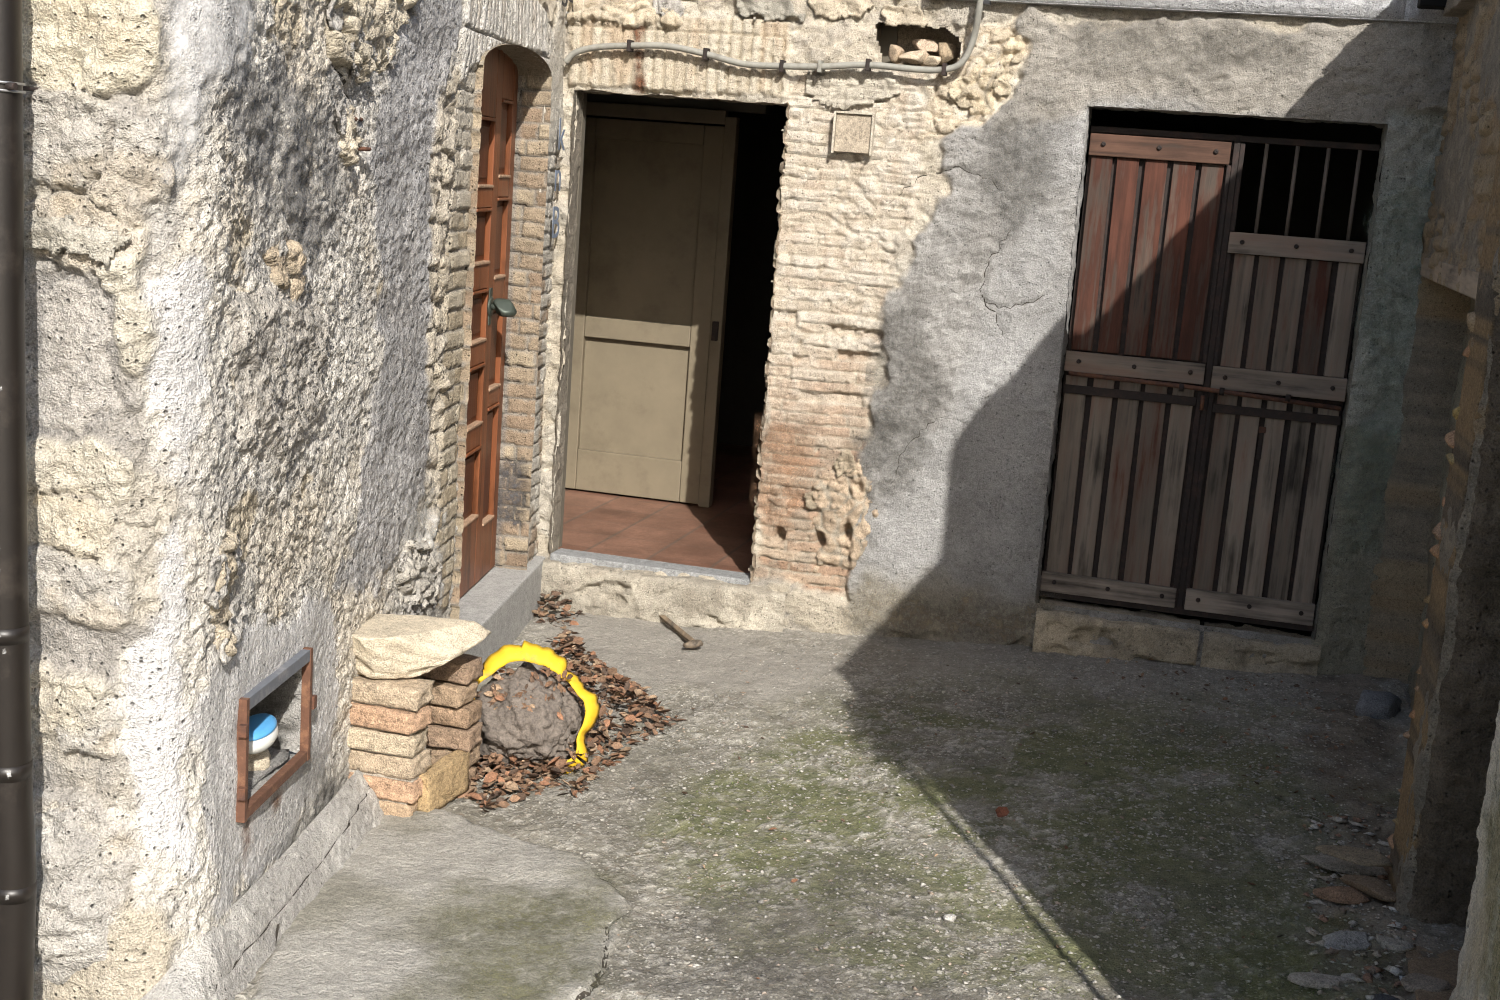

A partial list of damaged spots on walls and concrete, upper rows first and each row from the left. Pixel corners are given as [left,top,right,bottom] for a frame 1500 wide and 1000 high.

flaking render [565,0,686,30]
flaking render [804,449,879,572]
crack [575,917,621,1000]